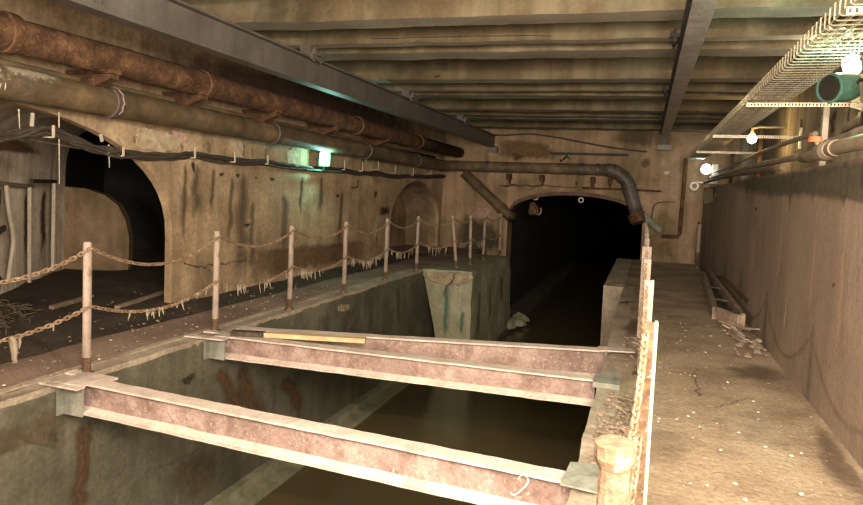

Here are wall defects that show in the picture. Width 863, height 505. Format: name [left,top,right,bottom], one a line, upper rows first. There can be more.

water stain [182,166,199,225]
water stain [738,163,863,202]
water stain [229,179,357,274]